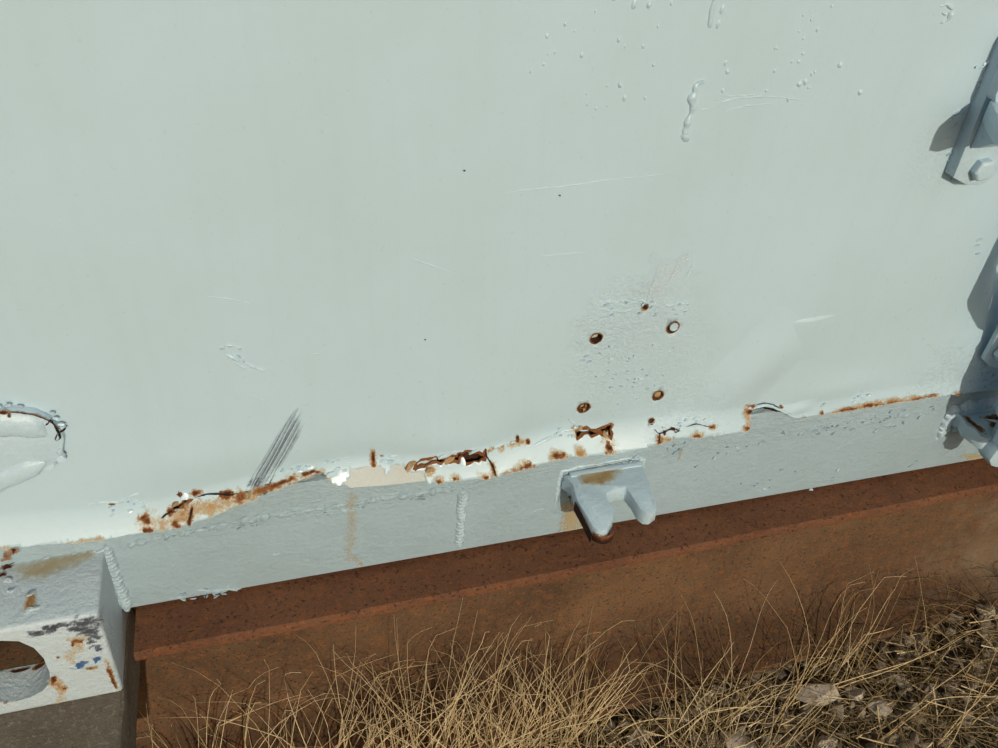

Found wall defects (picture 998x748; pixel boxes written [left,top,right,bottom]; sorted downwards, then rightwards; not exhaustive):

rust [743,403,784,432]
rust [820,393,938,415]
peeling [380,440,516,473]
rust [482,435,535,480]
rust [551,447,586,459]
rust [580,438,617,484]
rust [138,469,328,533]
rust [0,547,19,577]
rust [24,589,40,615]
rust [8,662,67,701]
rust [86,661,118,689]